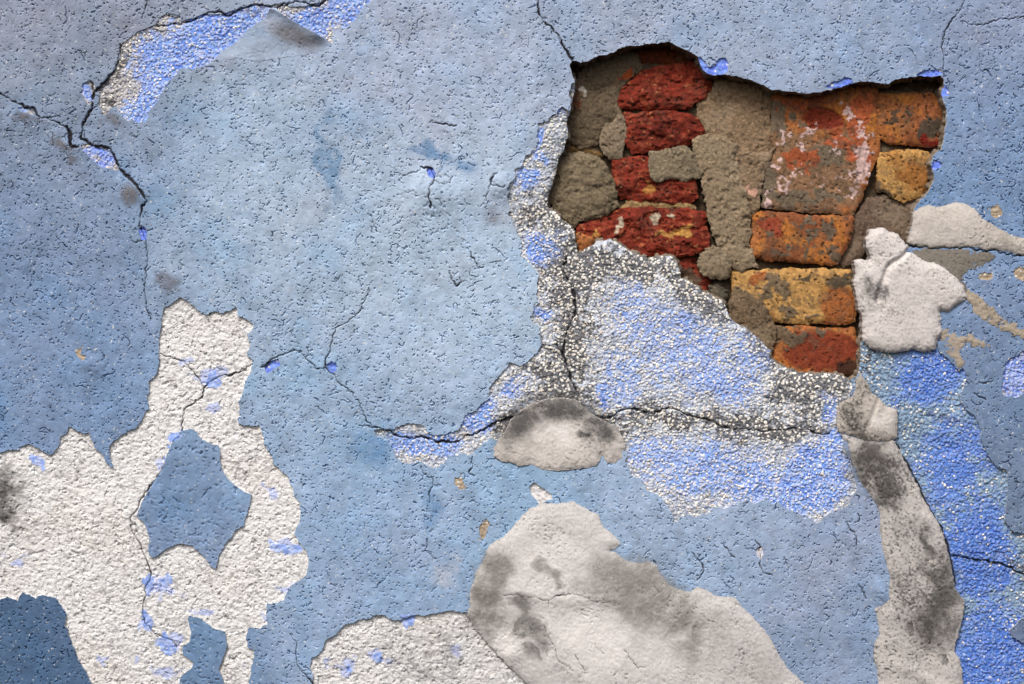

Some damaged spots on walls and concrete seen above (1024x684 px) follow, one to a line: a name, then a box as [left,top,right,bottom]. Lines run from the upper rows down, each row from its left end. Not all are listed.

peeling [80,0,372,127]
crack [144,1,324,27]
crack [1,45,151,318]
crack [906,243,1020,256]
crack [557,256,577,391]
crack [592,403,763,432]
flaking render [374,47,1024,684]
peeling [0,297,309,684]
crack [896,444,1023,583]
peeling [305,610,528,684]